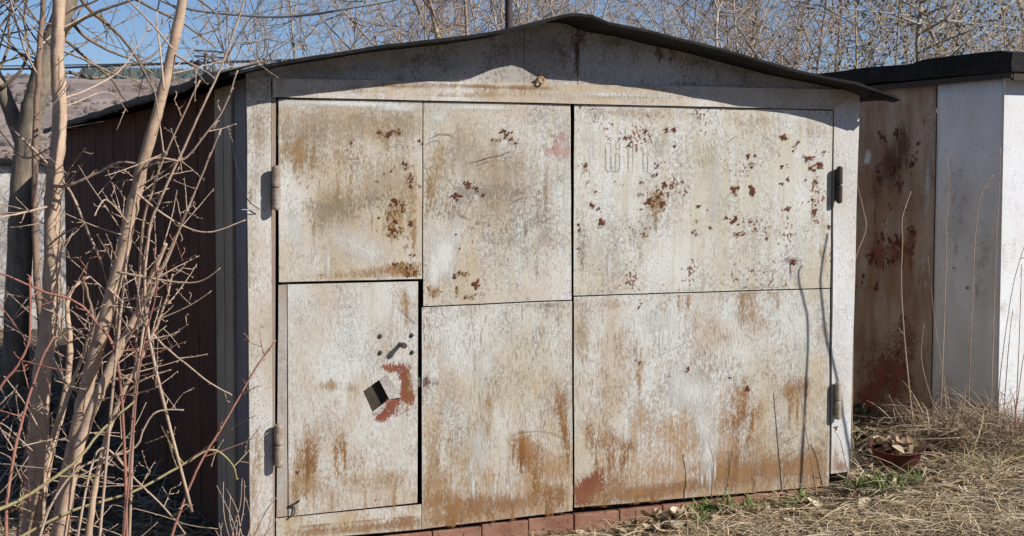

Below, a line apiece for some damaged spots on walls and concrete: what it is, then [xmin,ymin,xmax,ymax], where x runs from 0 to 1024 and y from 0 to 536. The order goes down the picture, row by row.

corrosion [373,362,430,422]
corrosion [853,321,923,412]
corrosion [426,379,846,527]